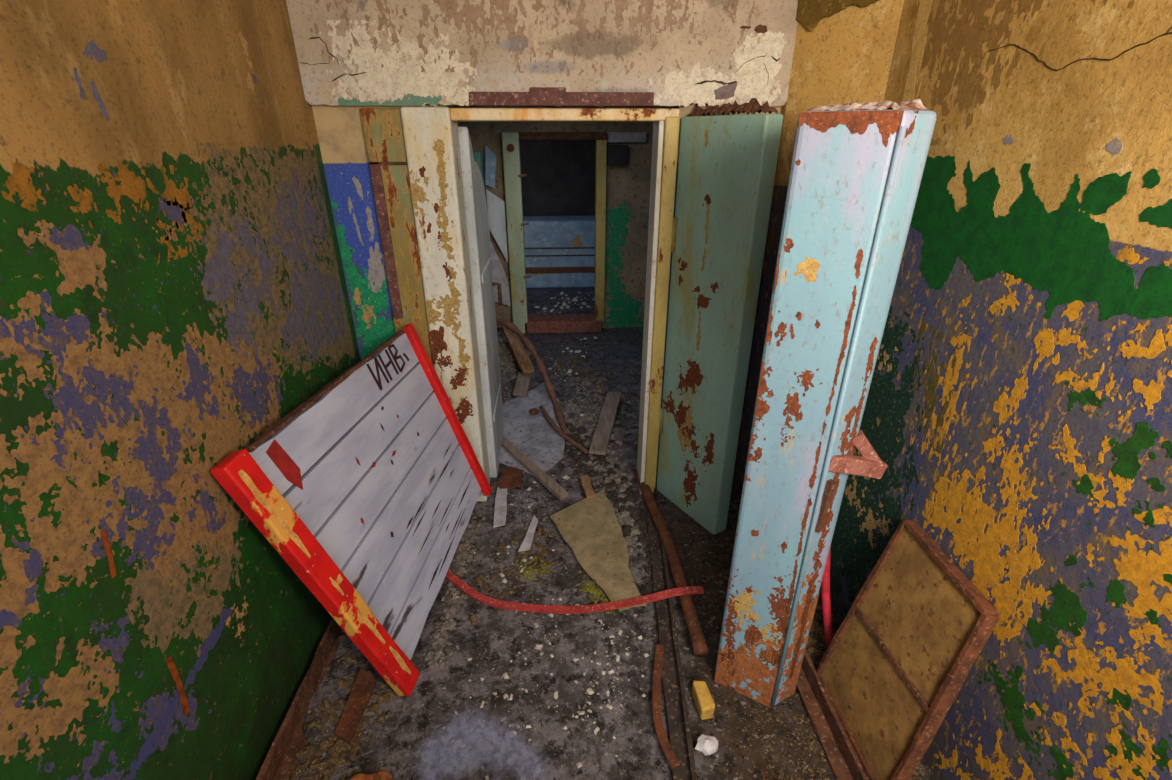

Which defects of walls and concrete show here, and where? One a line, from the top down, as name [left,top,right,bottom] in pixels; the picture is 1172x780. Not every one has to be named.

flaking render [310,0,787,107]
flaking render [797,0,879,32]
crack [987,28,1172,71]
peeling [0,140,396,763]
rust [409,139,474,424]
peeling [820,0,1172,780]